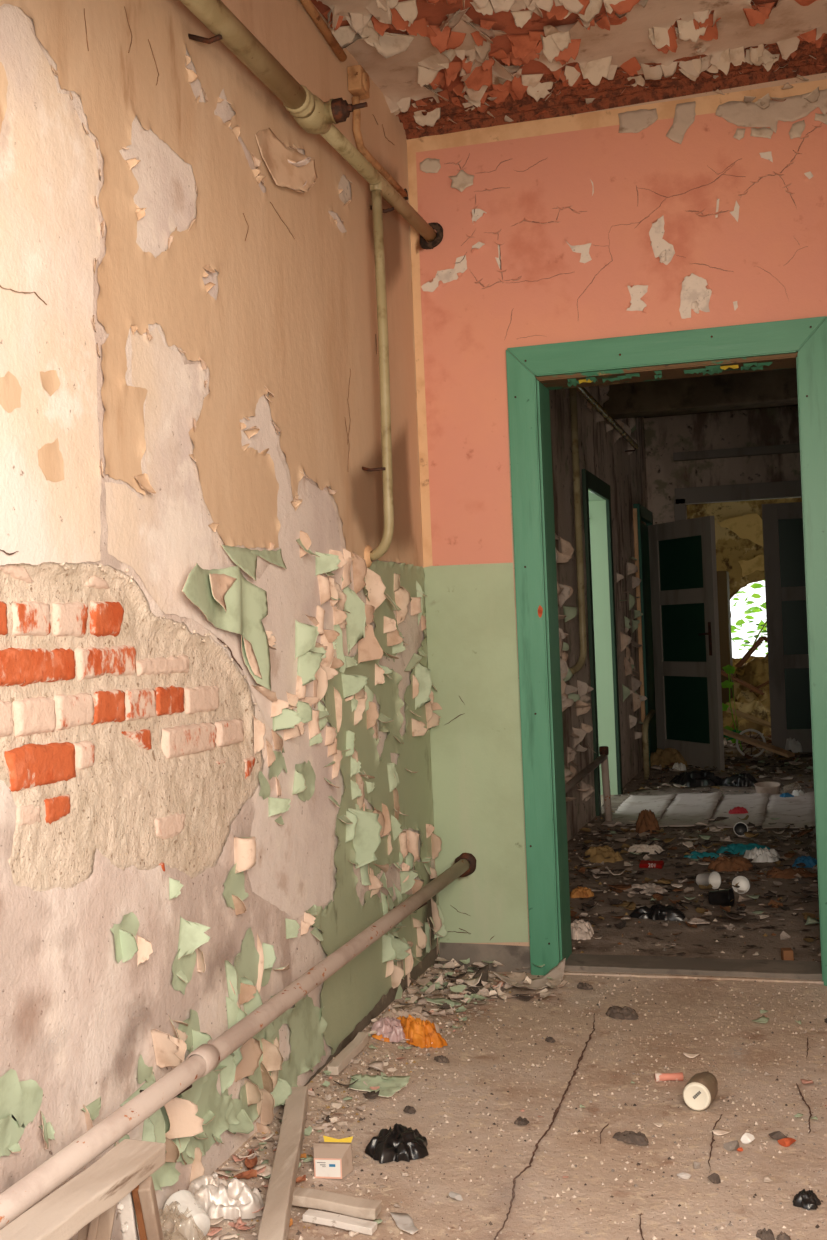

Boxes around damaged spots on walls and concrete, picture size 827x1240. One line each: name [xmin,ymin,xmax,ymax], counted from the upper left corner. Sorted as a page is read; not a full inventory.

peeling [567,243,592,263]
crack [446,124,823,317]
peeling [626,285,648,313]
peeling [649,216,675,265]
peeling [679,274,712,319]
peeling [0,6,506,1029]
peeling [557,580,596,802]
peeling [616,557,647,739]
peeling [0,1069,55,1157]
peeling [115,1009,292,1185]
peeling [306,1080,380,1123]
crack [494,1013,595,1240]